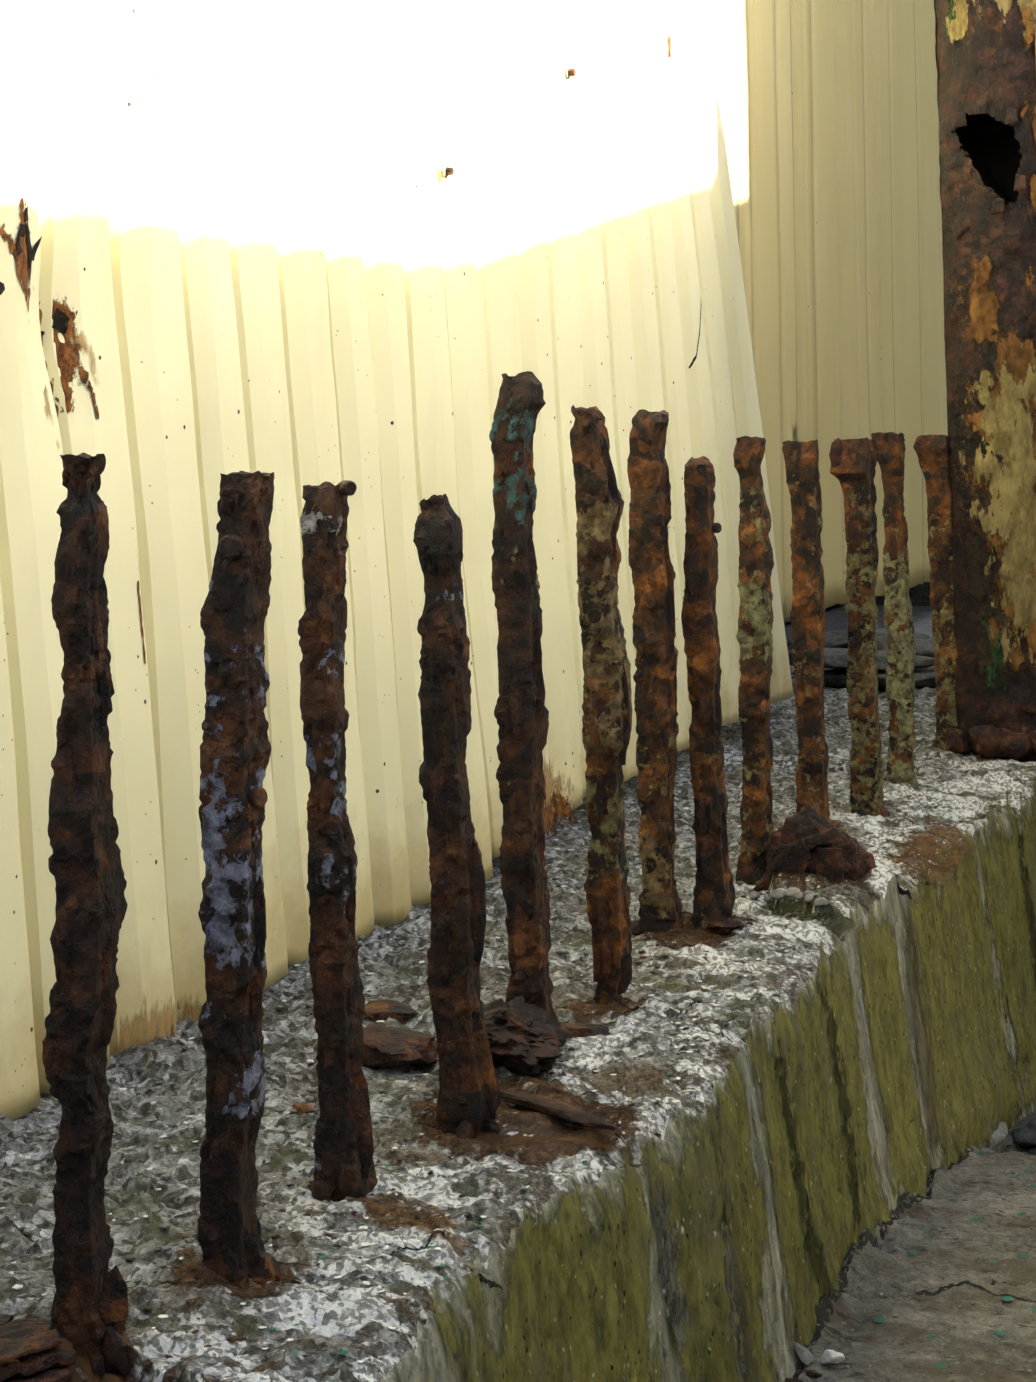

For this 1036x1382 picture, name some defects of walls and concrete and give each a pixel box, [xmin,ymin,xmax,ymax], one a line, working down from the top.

peeling [940,0,1036,49]
peeling [952,112,967,128]
corrosion [533,625,546,720]
corrosion [50,896,80,967]
corrosion [250,876,267,1022]
corrosion [398,1014,661,1168]
corrosion [555,892,758,1046]
leakage [775,1038,834,1306]
leakage [820,973,861,1231]
leakage [906,905,960,1165]
leakage [1017,819,1036,984]
corrosion [0,1265,197,1382]